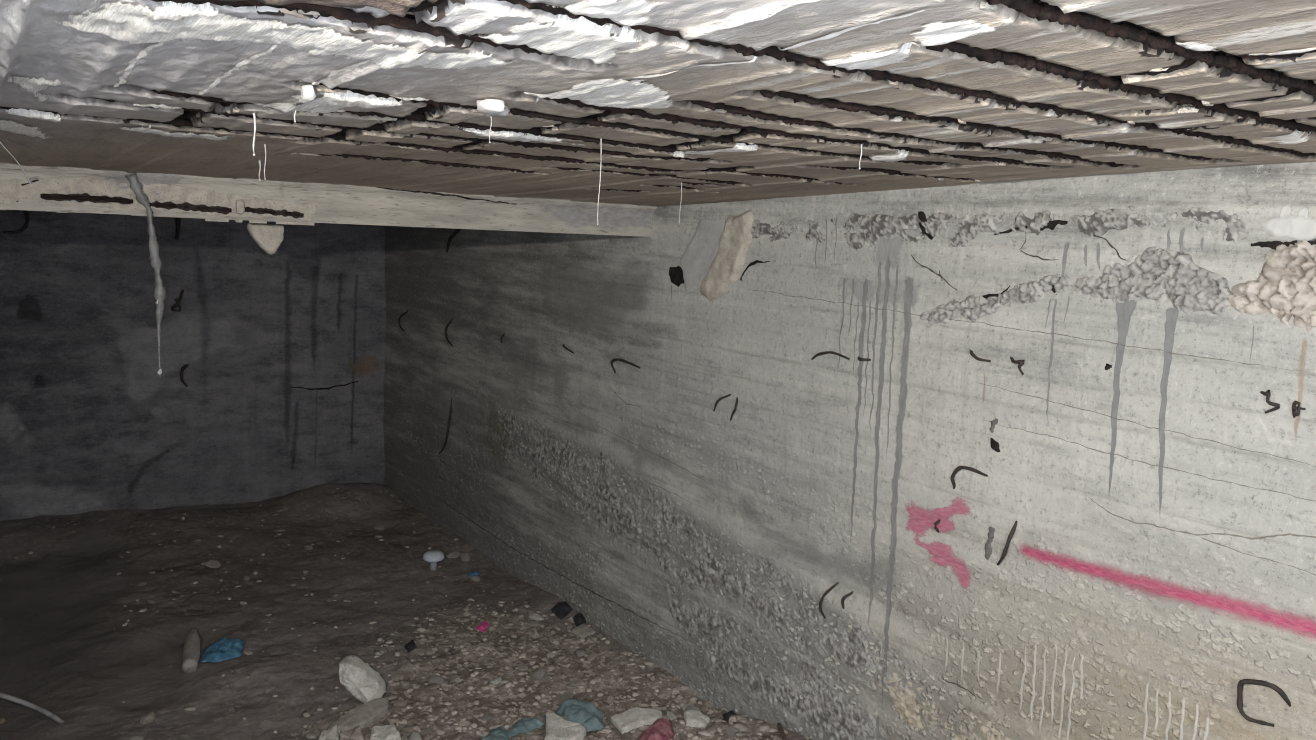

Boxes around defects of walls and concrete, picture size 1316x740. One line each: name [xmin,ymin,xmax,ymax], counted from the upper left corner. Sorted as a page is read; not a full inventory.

water stain [112,173,177,196]
spalling [669,265,684,287]
spalling [118,0,1316,192]
spalling [701,205,1247,302]
spalling [920,240,1316,333]
water stain [839,234,916,689]
water stain [1109,300,1136,491]
water stain [1159,308,1178,508]